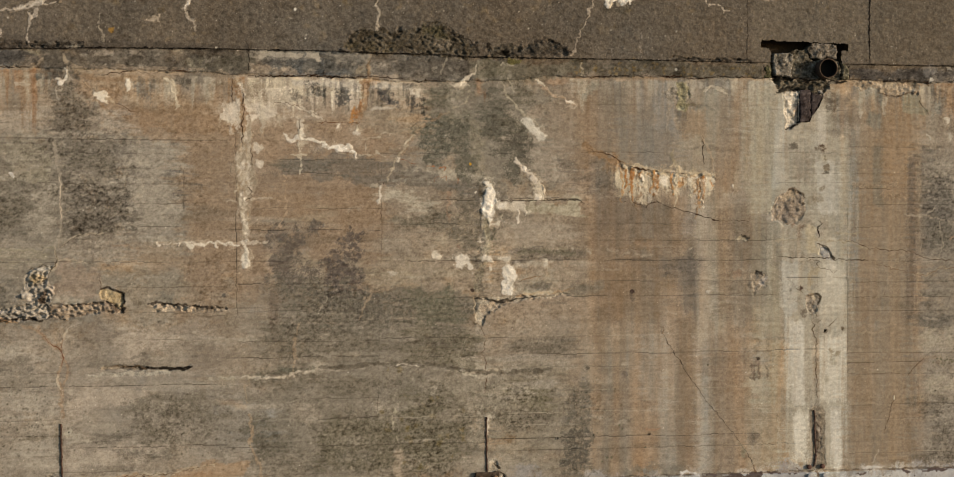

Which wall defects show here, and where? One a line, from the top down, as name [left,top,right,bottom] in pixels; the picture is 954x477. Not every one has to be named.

corrosion [0,67,39,138]
leakage [54,66,116,105]
crack [0,0,769,229]
leakage [565,78,600,113]
spalling [770,77,930,130]
leakage [123,73,594,344]
spalling [770,186,836,261]
peeling [0,256,127,325]
spalling [147,301,228,314]
crack [661,326,757,472]